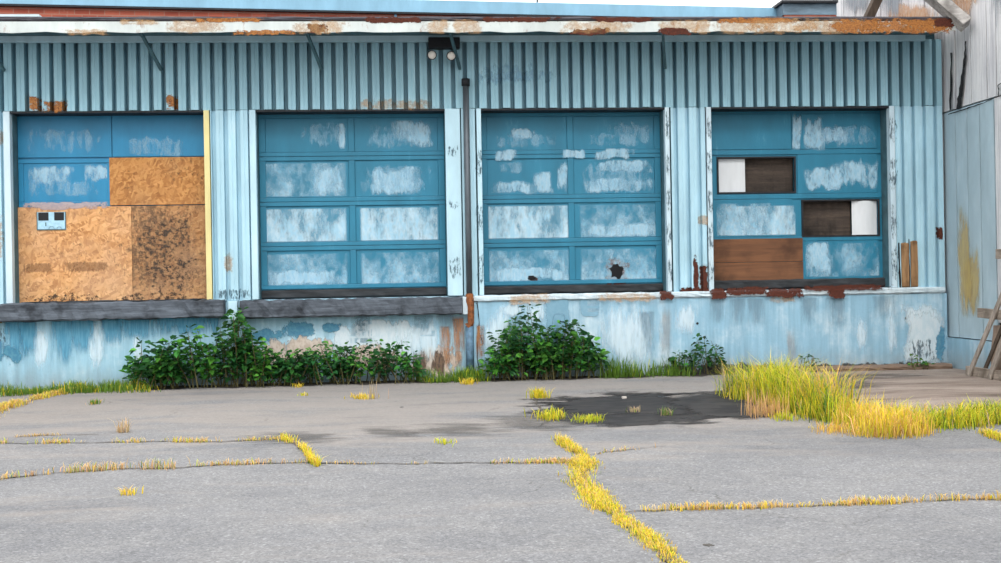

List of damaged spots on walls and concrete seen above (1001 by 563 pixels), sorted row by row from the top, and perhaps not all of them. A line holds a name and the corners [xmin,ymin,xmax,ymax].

rust [196,18,296,35]
rust [568,17,653,36]
rust [829,4,955,34]
peeling [496,149,651,194]
peeling [266,209,346,242]
peeling [361,208,438,240]
peeling [476,205,568,238]
rust [660,255,709,300]
leakage [526,390,784,427]
crack [175,433,341,468]
crack [396,459,534,467]
crack [565,446,686,563]